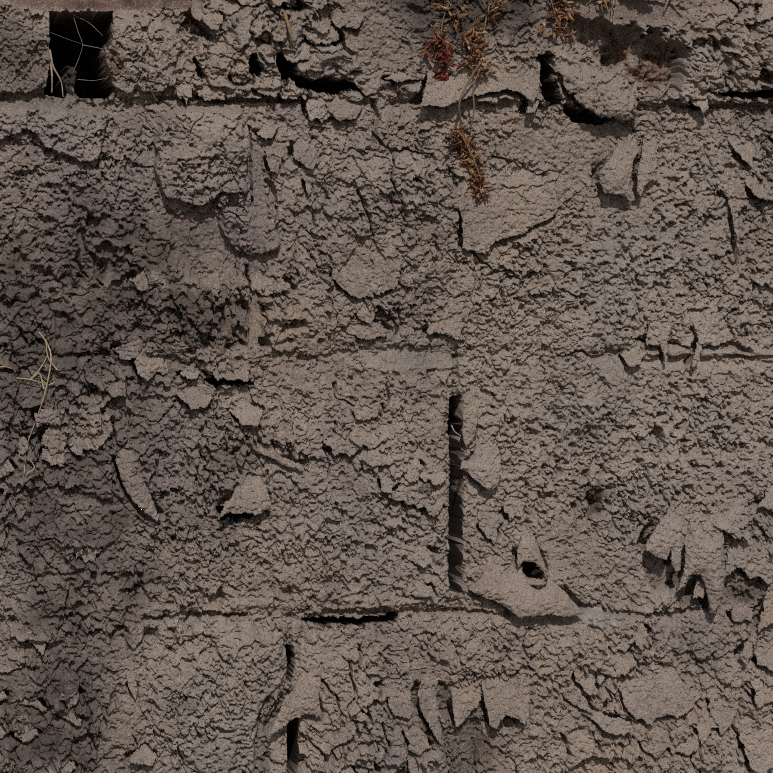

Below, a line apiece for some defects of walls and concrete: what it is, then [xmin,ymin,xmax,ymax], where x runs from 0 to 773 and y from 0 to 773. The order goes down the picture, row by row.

crack [246,126,280,224]
crack [356,98,430,236]
crack [492,156,565,177]
crack [242,264,252,335]
crack [467,250,550,292]
peeling [34,400,113,467]
peeling [115,439,160,521]
peeling [220,471,271,517]
peeling [256,401,449,517]
peeling [448,395,584,619]
peeling [254,492,773,773]
crack [321,660,392,773]